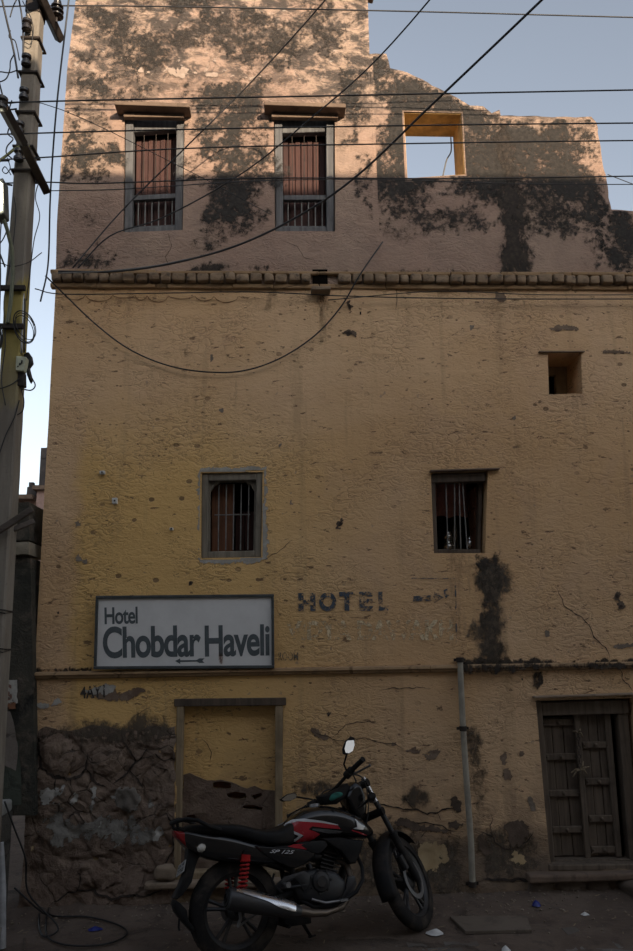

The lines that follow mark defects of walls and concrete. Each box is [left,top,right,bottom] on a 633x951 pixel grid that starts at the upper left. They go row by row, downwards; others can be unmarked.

leakage [463,552,633,690]
crack [557,589,633,691]
flaking render [17,712,275,909]